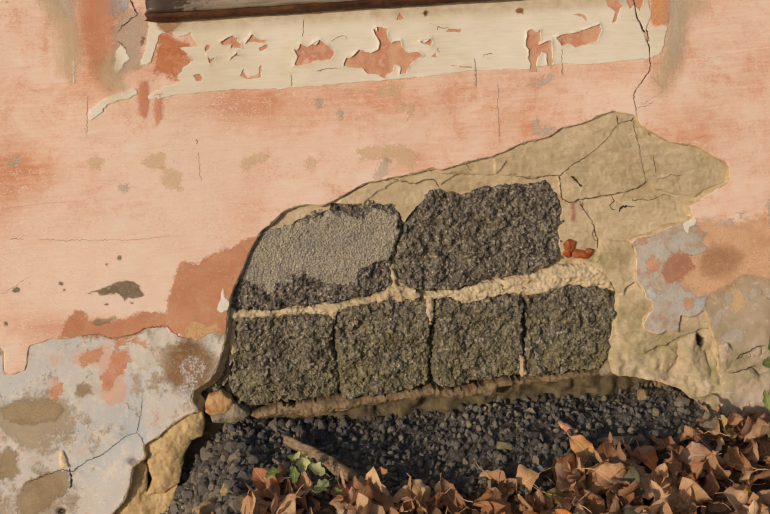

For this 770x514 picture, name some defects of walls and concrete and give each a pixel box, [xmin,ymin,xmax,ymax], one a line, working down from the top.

peeling [606,0,643,23]
peeling [113,45,130,73]
peeling [140,22,166,65]
peeling [221,35,269,59]
peeling [294,40,335,65]
peeling [344,27,437,81]
peeling [526,14,601,86]
peeling [88,88,138,120]
crack [513,0,679,248]
flaking render [0,111,770,514]
crack [733,345,764,373]
crack [22,405,143,489]